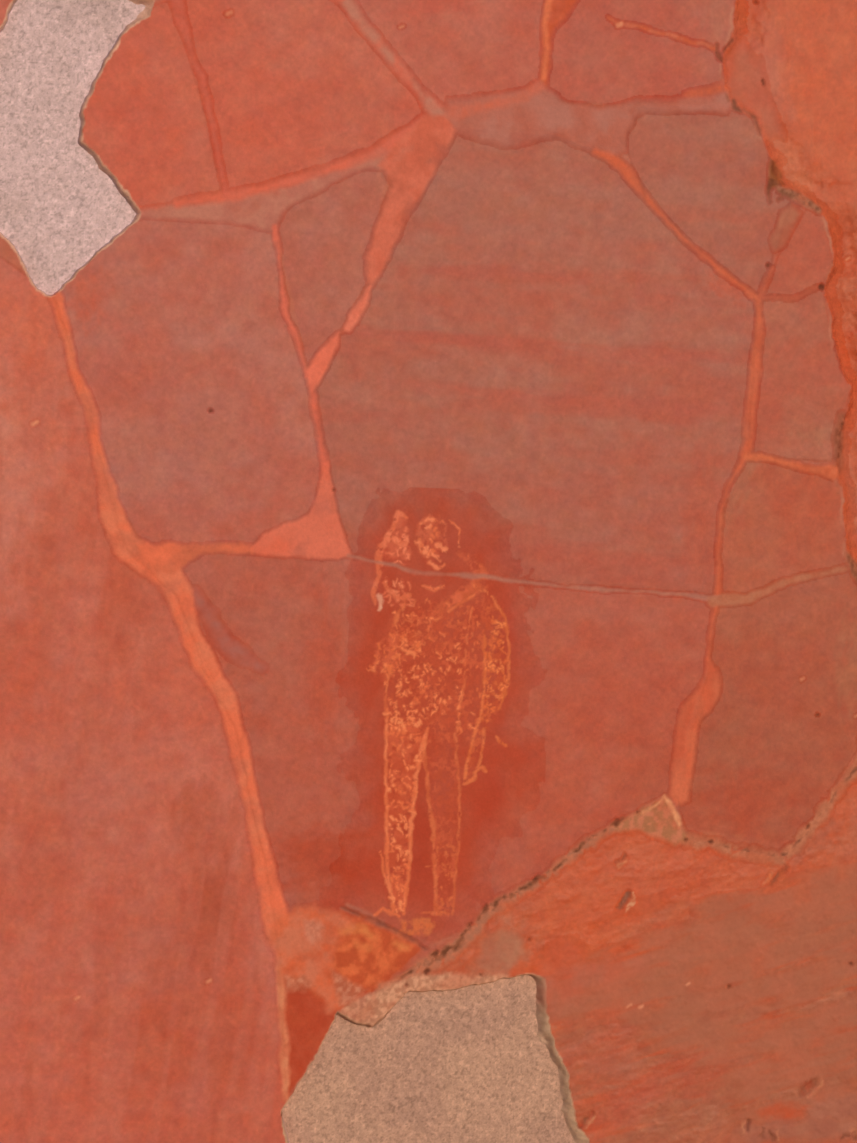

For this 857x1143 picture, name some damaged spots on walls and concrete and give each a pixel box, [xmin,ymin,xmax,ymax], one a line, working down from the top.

spalling [0,0,153,296]
crack [538,0,581,84]
crack [605,0,750,64]
crack [724,95,763,137]
crack [47,0,459,1104]
crack [336,138,857,1030]
spalling [614,889,638,914]
spalling [280,910,598,1143]